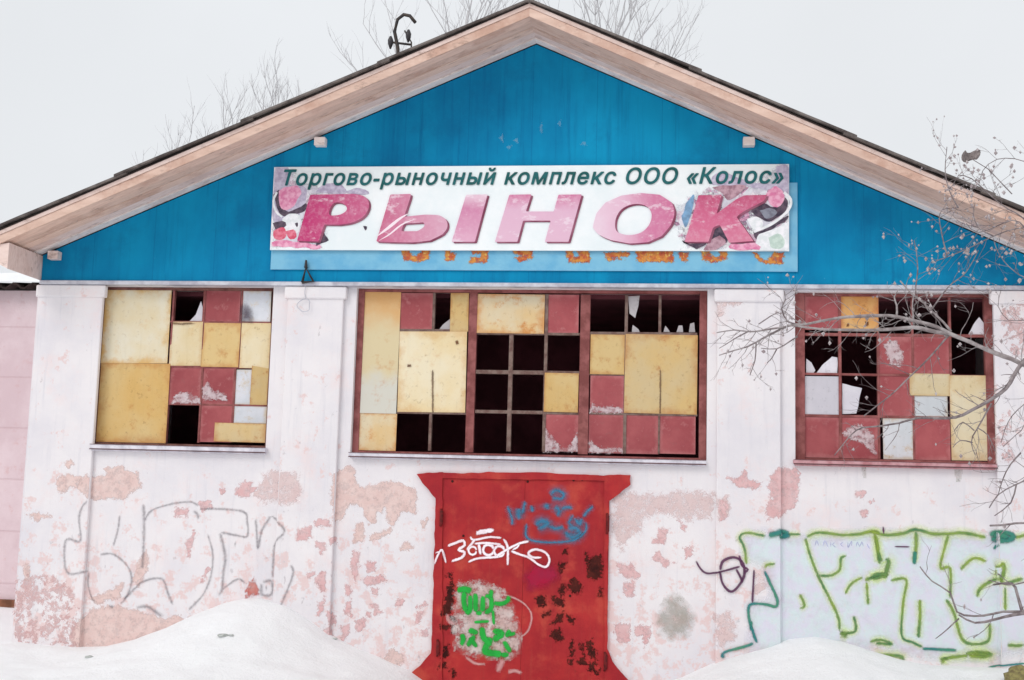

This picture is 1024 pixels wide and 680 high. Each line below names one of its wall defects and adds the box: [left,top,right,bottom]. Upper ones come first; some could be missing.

peeling [56,460,142,501]
peeling [174,470,301,517]
peeling [726,467,801,520]
peeling [13,552,184,647]
peeling [245,578,259,598]
peeling [297,465,429,641]
corrosion [438,572,457,678]
corrosion [534,549,604,676]
peeling [616,562,640,597]
peeling [613,623,652,644]
peeling [610,491,730,568]
leakage [658,601,690,635]